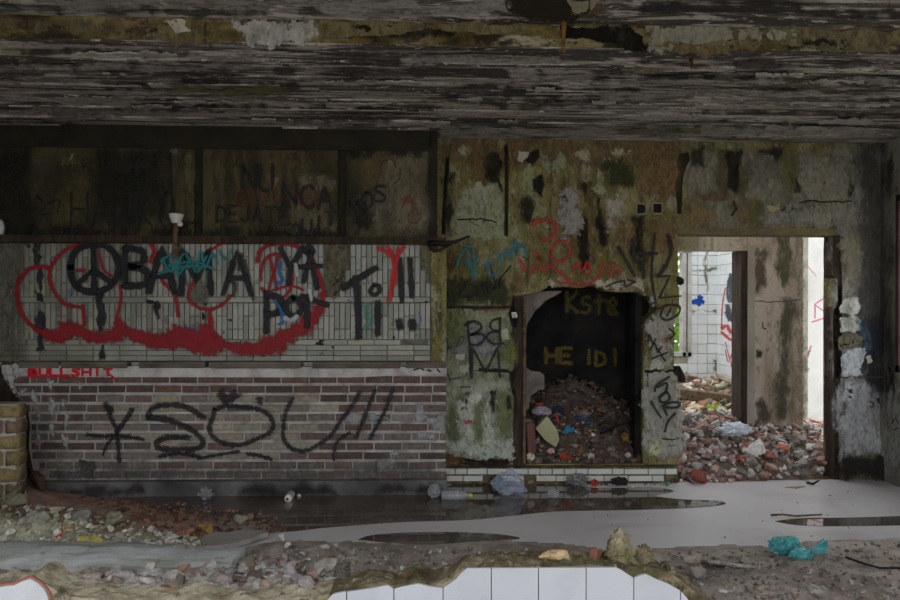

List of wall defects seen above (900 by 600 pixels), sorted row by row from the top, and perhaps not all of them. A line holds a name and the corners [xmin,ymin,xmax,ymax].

spalling [78,0,900,58]
peeling [756,72,864,86]
peeling [736,103,890,139]
crack [457,218,497,226]
water stain [313,54,900,461]
peeling [585,277,687,462]
peeling [832,297,900,471]